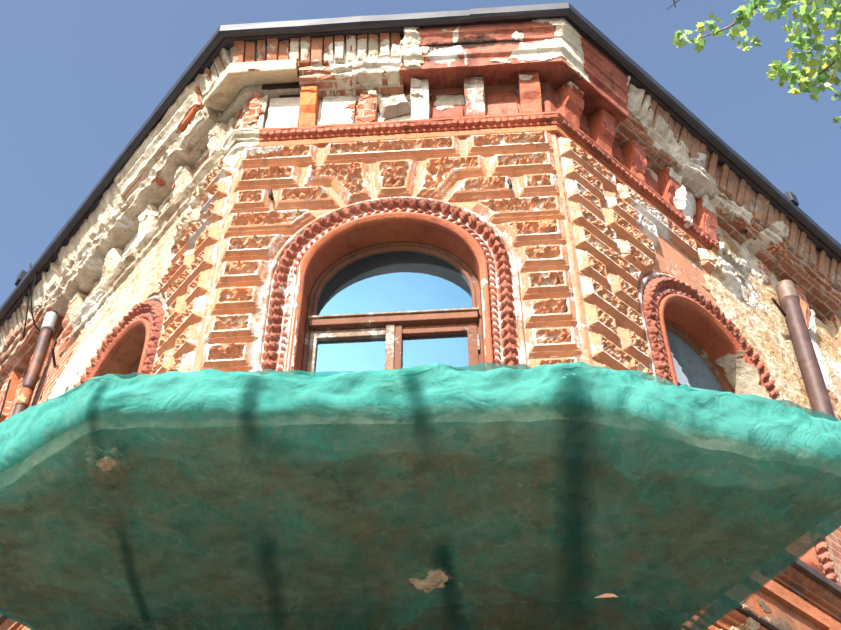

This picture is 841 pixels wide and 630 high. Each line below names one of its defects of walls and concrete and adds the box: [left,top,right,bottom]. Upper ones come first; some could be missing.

peeling [138,149,209,222]
peeling [208,92,264,181]
peeling [286,27,429,125]
peeling [434,94,465,111]
peeling [441,26,463,51]
peeling [491,18,590,94]
peeling [626,75,753,228]
peeling [698,226,790,312]
flaking render [0,367,29,423]
flaking render [36,296,82,404]
peeling [715,350,781,399]
peeling [808,304,841,390]